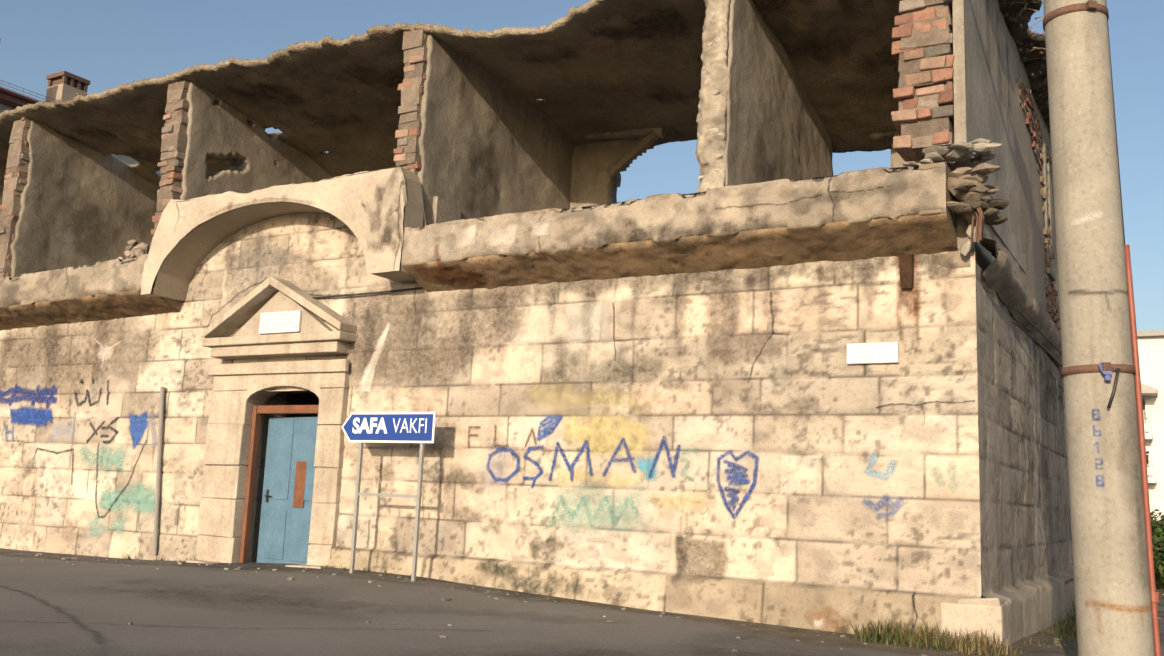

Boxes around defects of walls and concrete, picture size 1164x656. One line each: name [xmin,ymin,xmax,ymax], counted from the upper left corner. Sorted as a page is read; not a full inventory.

flaking render [0,117,31,278]
flaking render [118,81,190,259]
flaking render [362,26,549,258]
flaking render [891,0,1009,256]
flaking render [1017,79,1061,330]